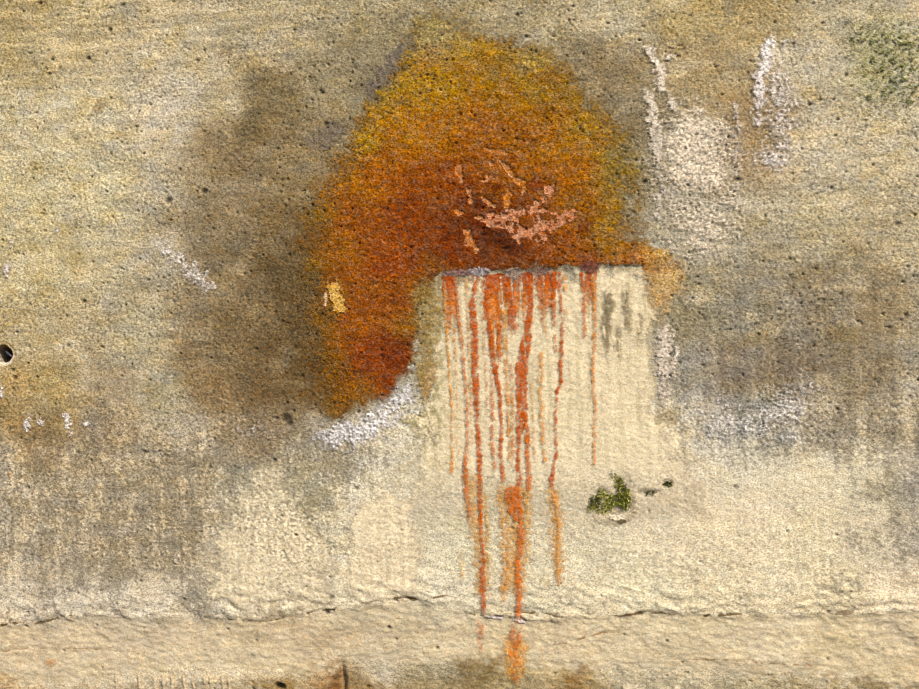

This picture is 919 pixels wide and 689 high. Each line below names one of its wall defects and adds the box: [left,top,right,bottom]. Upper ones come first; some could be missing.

water stain [0,396,339,617]
corrosion [295,9,685,680]
water stain [155,25,919,601]
spalling [609,513,627,521]